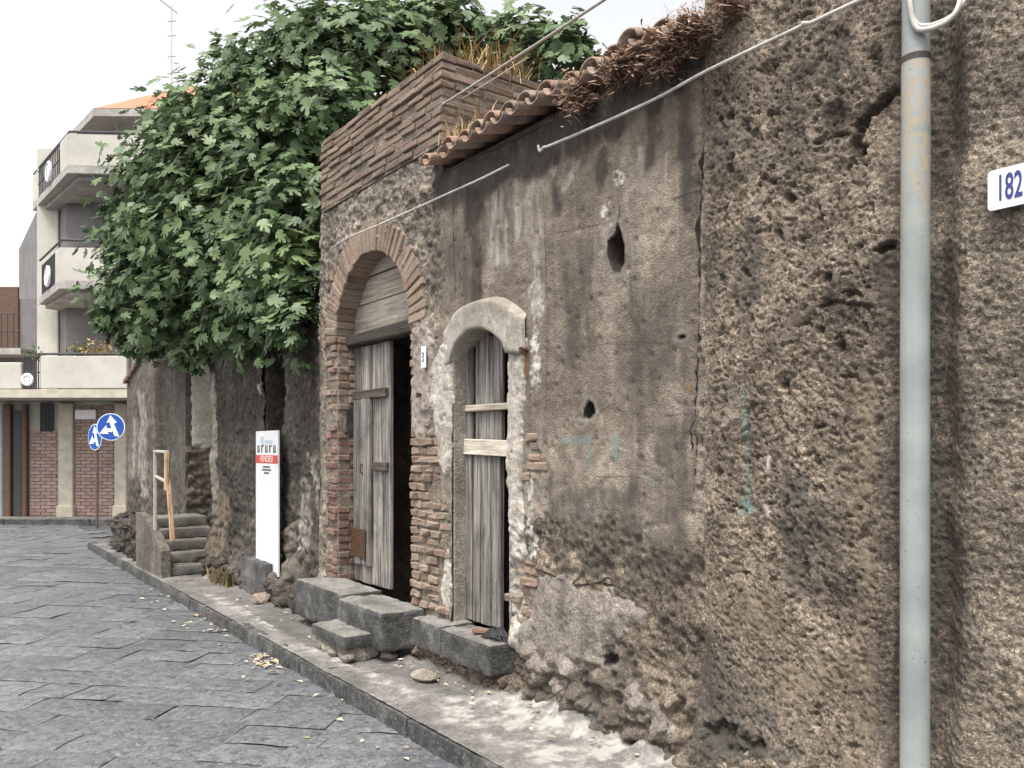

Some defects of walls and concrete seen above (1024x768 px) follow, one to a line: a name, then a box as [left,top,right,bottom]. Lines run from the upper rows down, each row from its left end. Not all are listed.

water stain [434,55,705,302]
spalling [604,217,629,278]
crack [583,131,705,513]
flaking render [504,326,548,653]
spalling [578,697,600,731]
spalling [599,647,624,671]